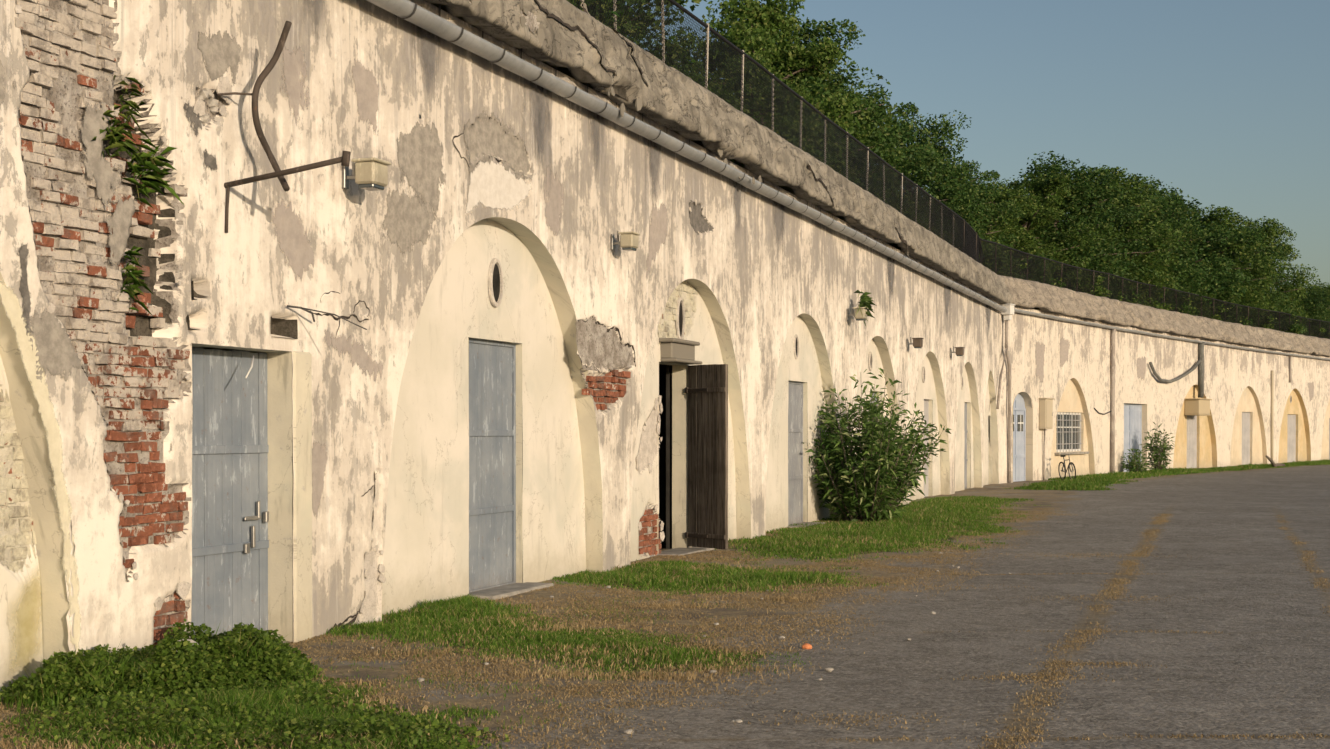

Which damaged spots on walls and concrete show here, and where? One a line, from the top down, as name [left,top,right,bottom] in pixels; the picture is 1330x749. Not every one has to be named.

crack [535,0,649,87]
peeling [184,30,241,171]
crack [452,111,532,175]
spalling [463,111,564,236]
crack [807,162,834,207]
crack [894,221,909,258]
flaking render [0,0,207,654]
crack [310,300,370,335]
spalling [575,317,636,424]
flaking render [638,502,665,557]